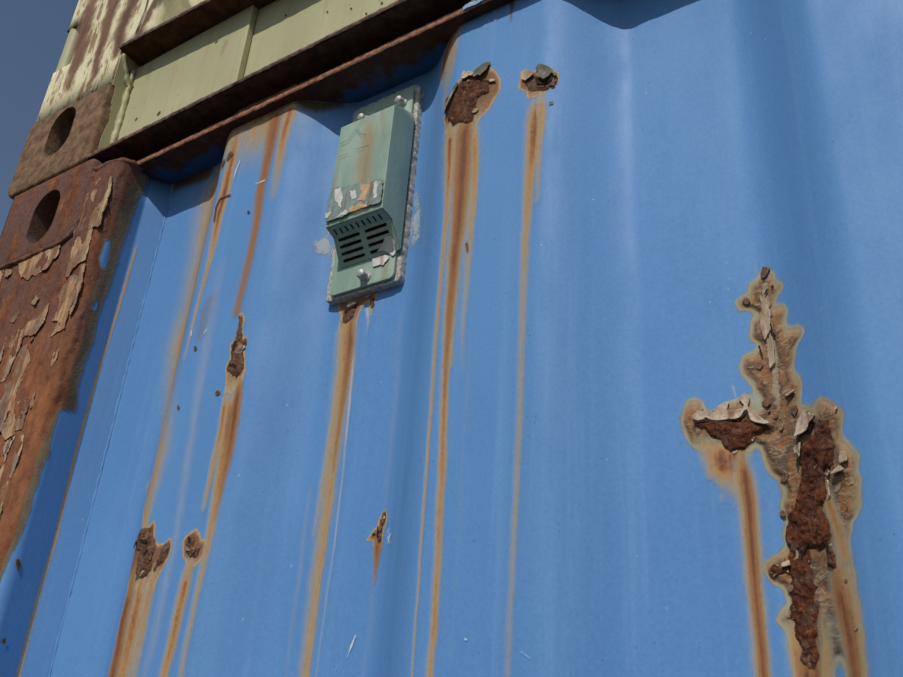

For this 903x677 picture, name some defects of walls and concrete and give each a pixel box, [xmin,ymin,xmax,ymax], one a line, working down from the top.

rust [442,24,463,81]
peeling [0,176,112,515]
rust [0,161,148,677]
rust [108,101,342,677]
rust [302,292,378,677]
rust [366,510,387,575]
peeling [680,265,868,677]